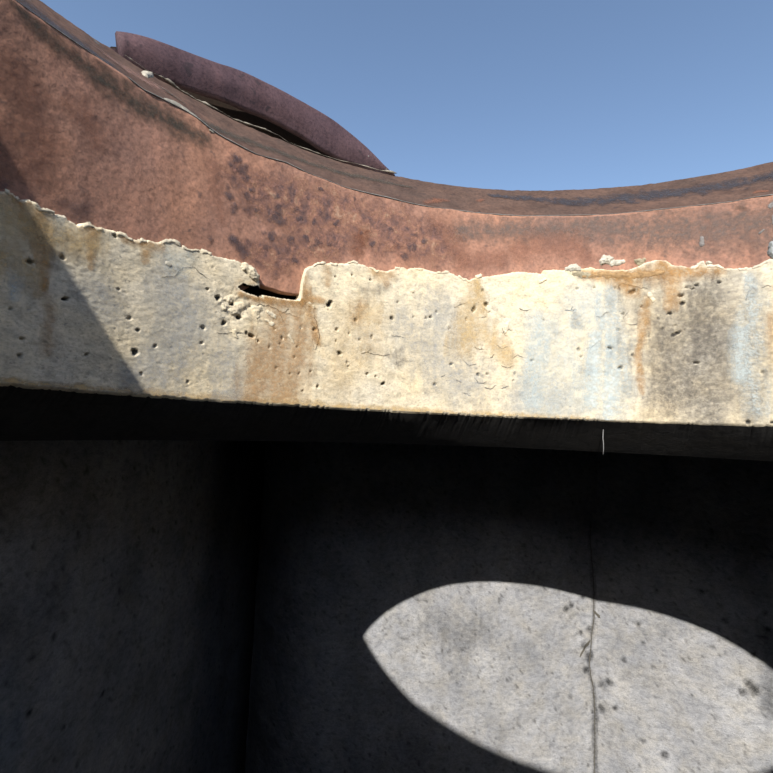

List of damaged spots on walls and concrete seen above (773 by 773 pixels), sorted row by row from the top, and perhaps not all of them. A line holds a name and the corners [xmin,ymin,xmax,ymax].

water stain [455,209,773,246]
water stain [489,173,773,205]
corrosion [584,260,720,302]
water stain [62,282,457,414]
corrosion [240,290,324,404]
water stain [478,315,559,418]
water stain [584,291,630,420]
crack [580,521,600,773]